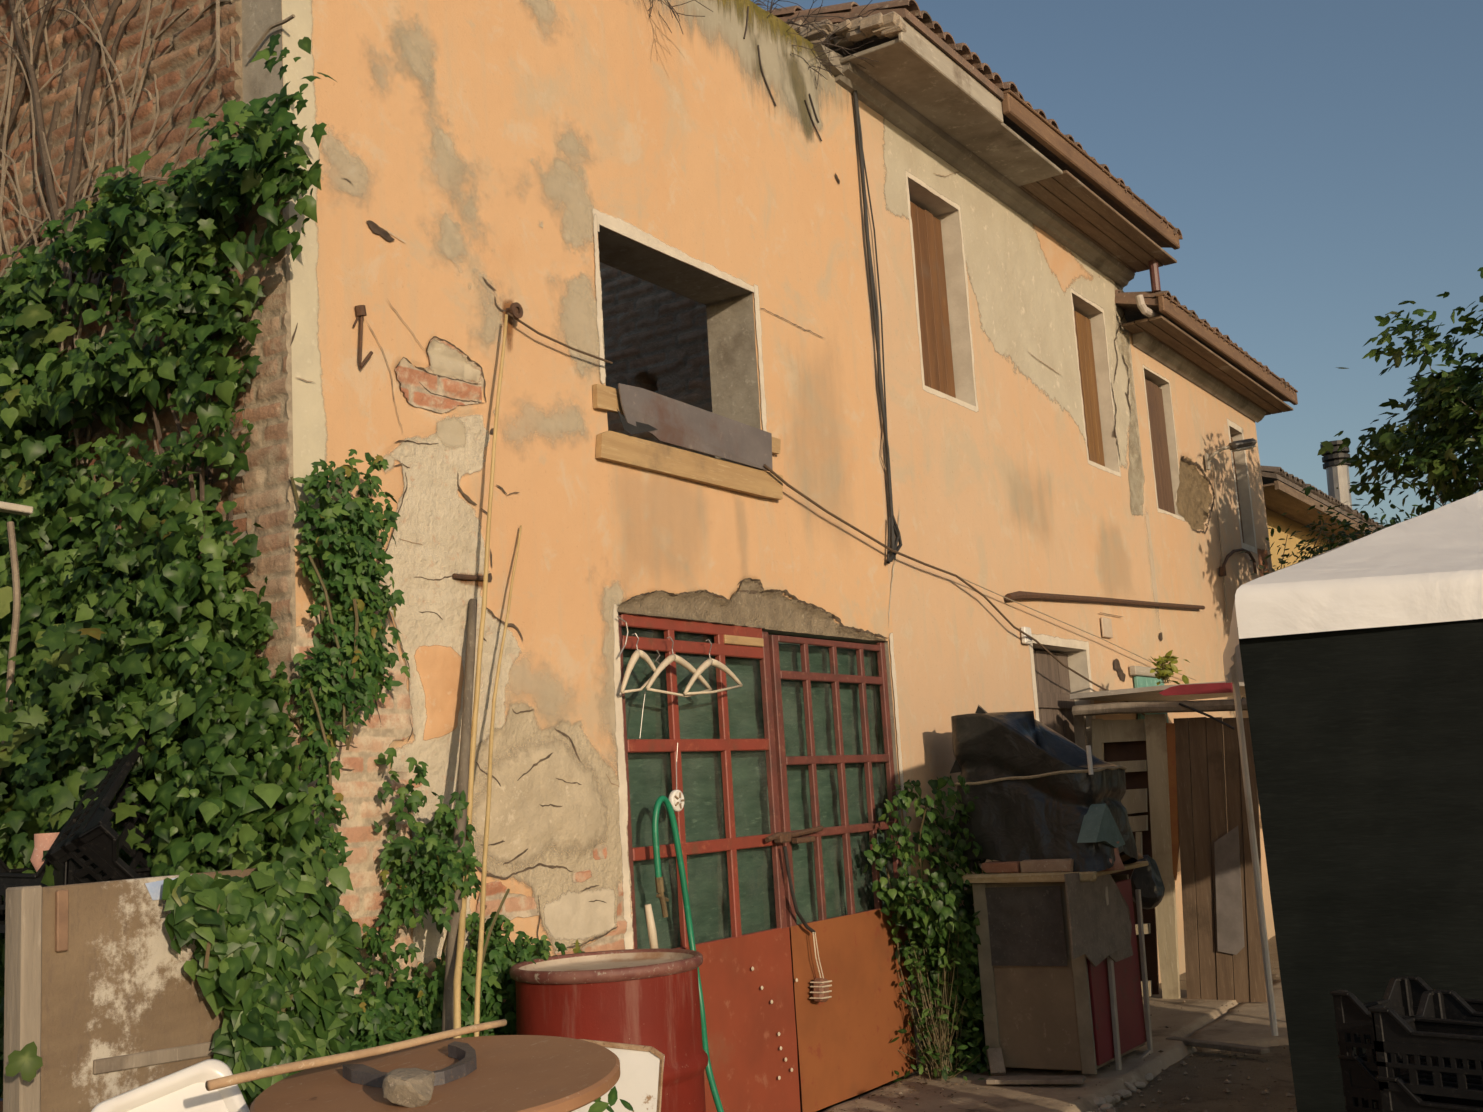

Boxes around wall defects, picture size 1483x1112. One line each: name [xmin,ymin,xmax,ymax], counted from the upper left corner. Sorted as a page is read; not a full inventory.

water stain [661,0,848,136]
flaking render [367,220,405,242]
peeling [428,114,467,196]
peeling [532,159,594,248]
peeling [478,274,502,343]
peeling [561,274,604,375]
flaking render [1111,282,1145,516]
flaking render [294,336,634,997]